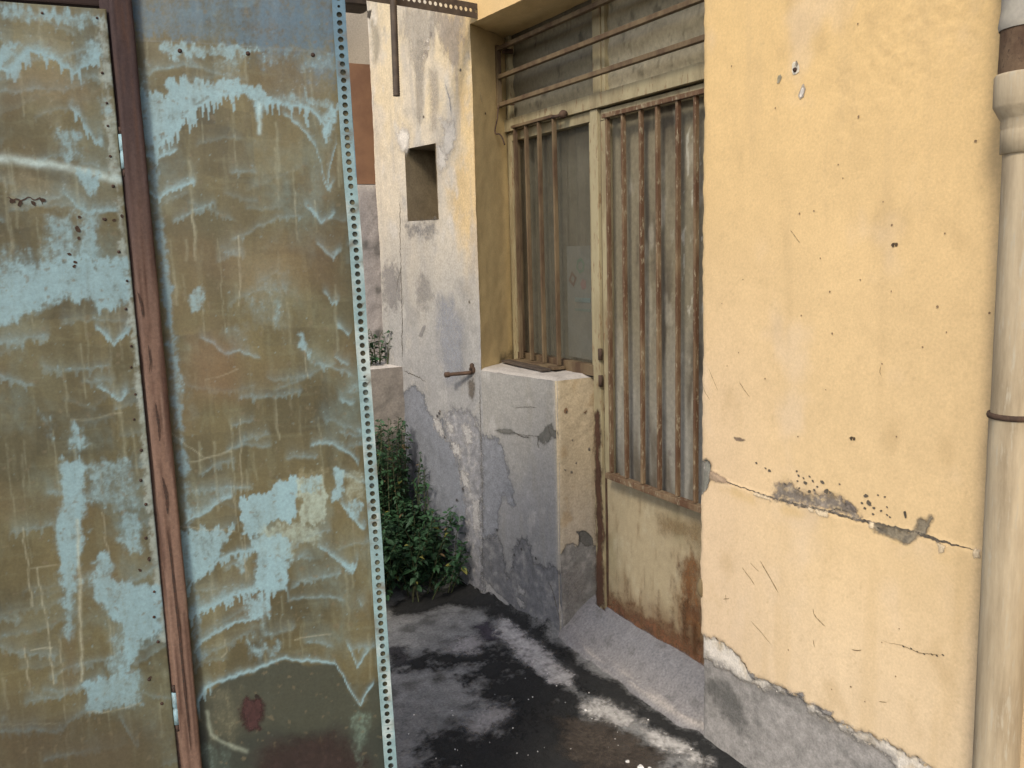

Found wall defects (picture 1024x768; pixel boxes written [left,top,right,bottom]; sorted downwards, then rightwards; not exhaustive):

flaking render [403,386,597,632]
rust [593,410,704,666]
peeling [773,470,933,544]
crack [727,481,980,558]
damp [447,618,575,686]
damp [462,706,511,735]
damp [579,698,714,765]
flaking render [703,635,932,768]